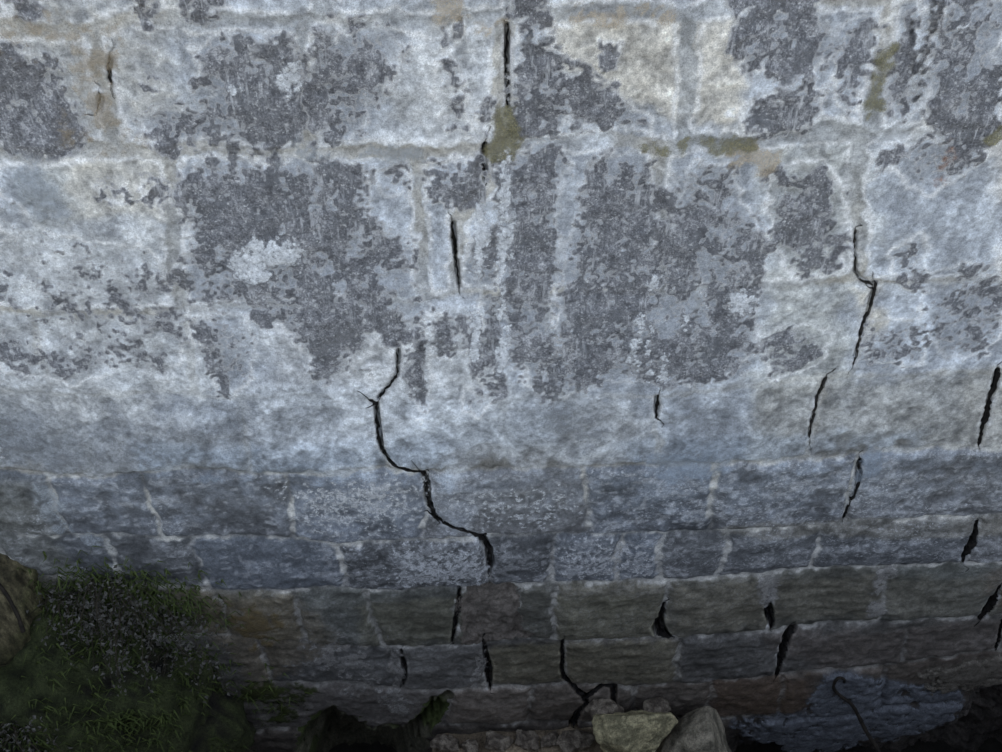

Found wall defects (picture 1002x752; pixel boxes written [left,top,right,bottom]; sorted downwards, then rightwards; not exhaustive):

peeling [723,0,1002,182]
crack [448,213,464,298]
crack [808,223,877,450]
crack [358,314,492,580]
crack [449,580,462,646]
crack [994,619,1002,650]
crack [559,635,616,728]